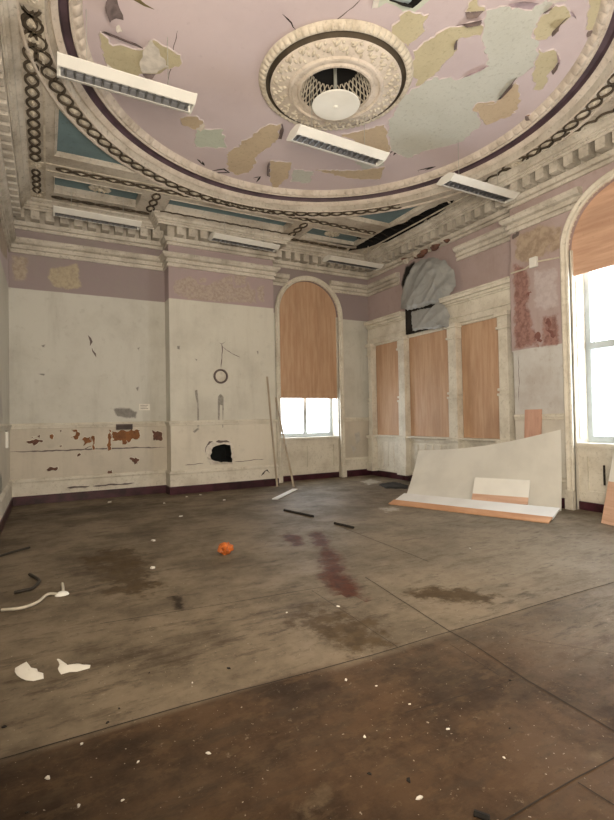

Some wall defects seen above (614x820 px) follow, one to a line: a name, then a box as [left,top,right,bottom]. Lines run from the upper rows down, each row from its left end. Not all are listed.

peeling [98,0,183,79]
peeling [315,0,576,180]
peeling [179,115,292,188]
peeling [509,220,565,352]
peeling [26,429,96,457]
peeling [106,429,141,451]
peeling [151,430,163,442]
spalling [205,440,234,465]
damp [251,529,521,679]